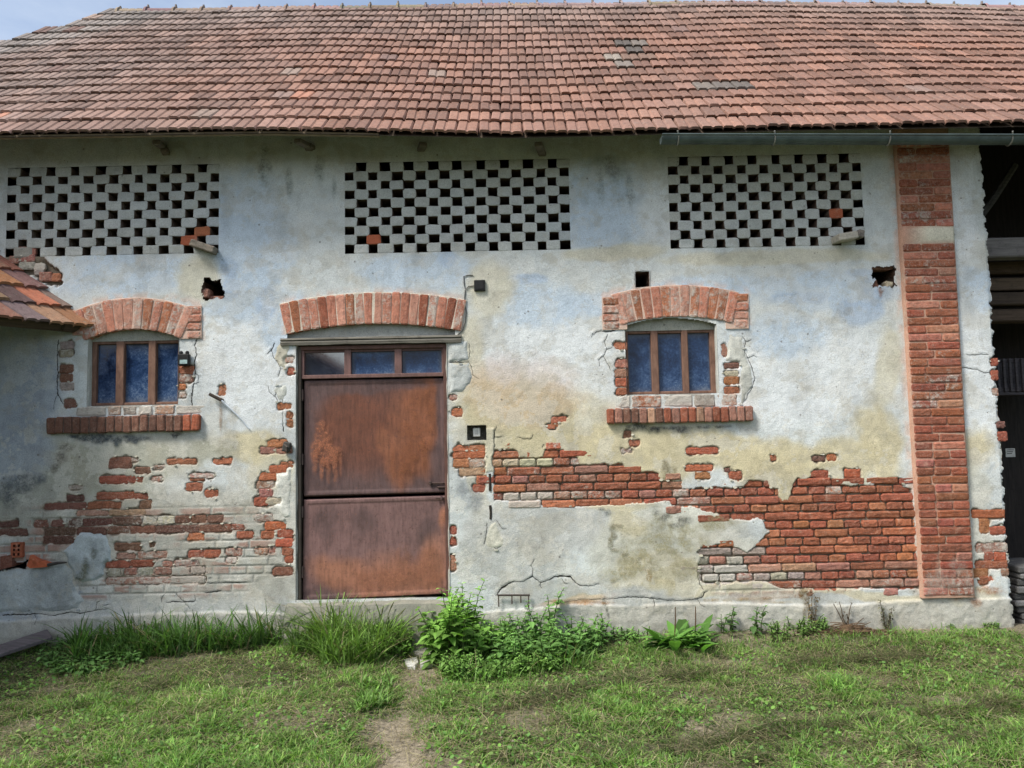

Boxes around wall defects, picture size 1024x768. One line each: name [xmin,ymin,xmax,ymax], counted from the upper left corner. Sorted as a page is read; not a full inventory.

spalling [201,277,224,301]
spalling [872,266,897,288]
flaking render [58,341,78,409]
flaking render [285,357,297,375]
flaking render [613,342,628,397]
corrosion [311,422,341,476]
flaking render [0,402,295,585]
flaking render [448,393,919,596]
flaking render [971,509,1009,585]
crack [495,559,705,606]